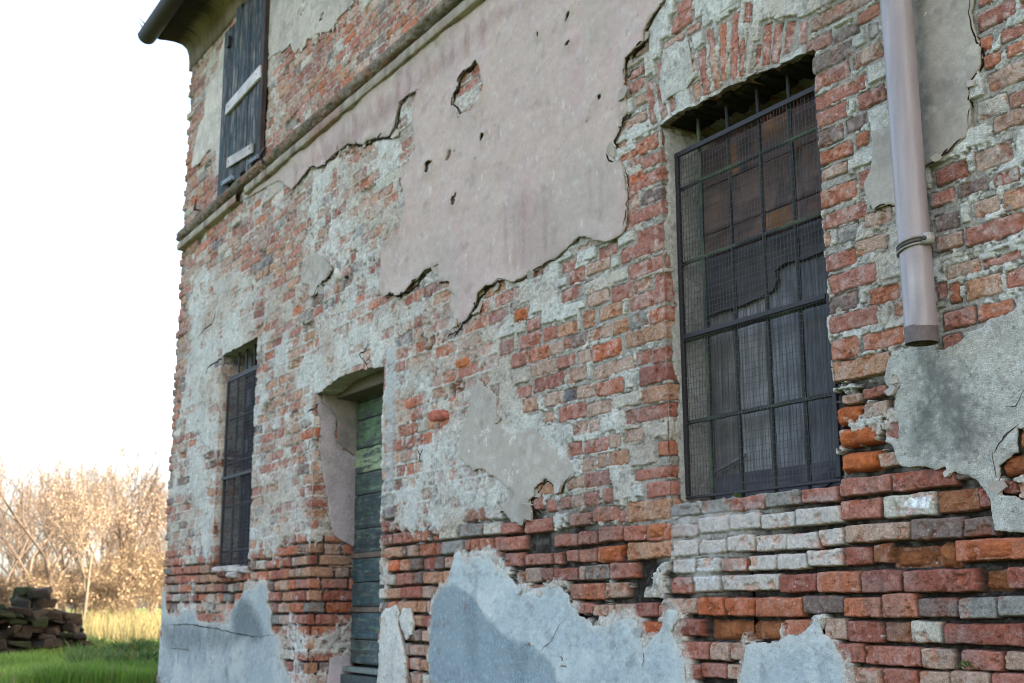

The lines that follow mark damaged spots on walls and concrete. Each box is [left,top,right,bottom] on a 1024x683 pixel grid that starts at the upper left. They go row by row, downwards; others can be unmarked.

peeling [191,26,230,175]
peeling [244,0,665,329]
peeling [864,126,895,210]
peeling [912,0,981,169]
peeling [316,394,360,547]
peeling [457,380,575,526]
peeling [837,302,1024,591]
crack [166,624,279,651]
peeling [158,582,291,683]
peeling [379,605,416,683]
peeling [430,551,686,683]
peeling [714,620,847,683]